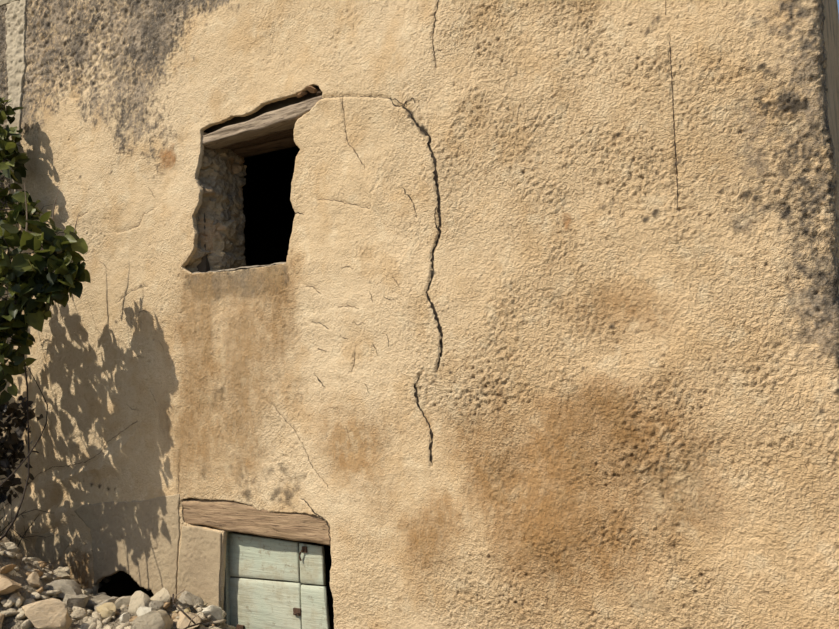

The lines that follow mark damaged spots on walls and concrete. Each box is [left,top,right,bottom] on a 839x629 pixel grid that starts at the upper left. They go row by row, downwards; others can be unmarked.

crack [431,0,439,67]
crack [669,35,678,207]
damp [197,312,267,465]
damp [187,265,288,376]
crack [320,95,443,465]